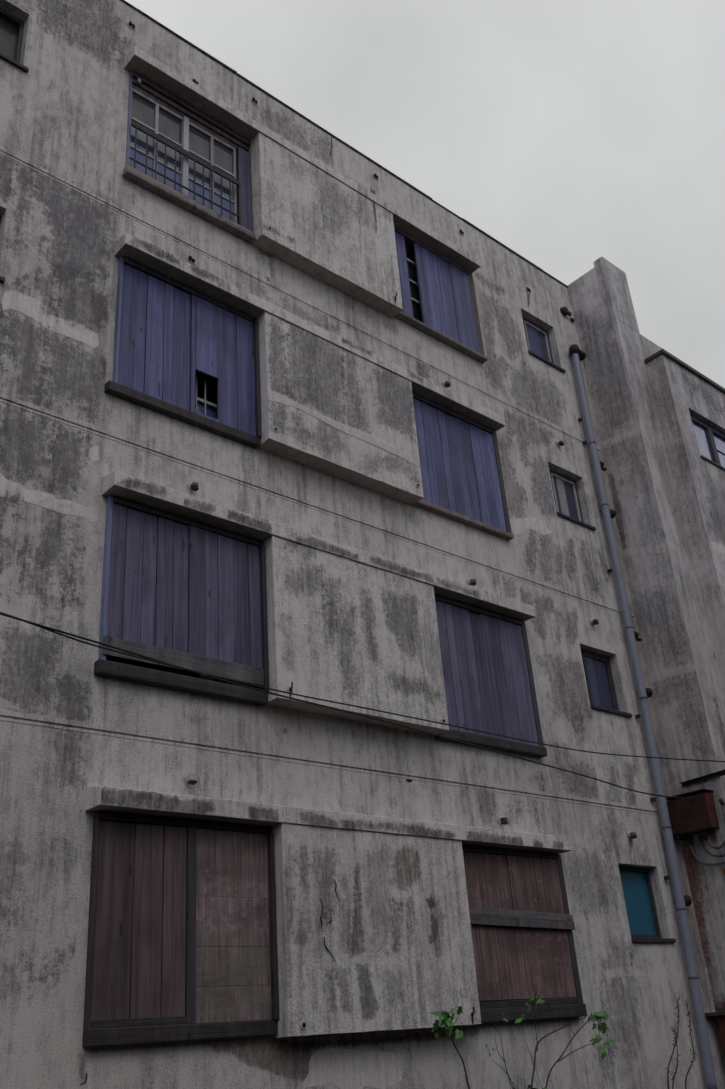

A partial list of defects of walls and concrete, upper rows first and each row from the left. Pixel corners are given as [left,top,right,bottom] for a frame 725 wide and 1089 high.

damp [40,0,126,62]
damp [268,310,430,452]
crack [320,879,339,963]
damp [357,964,378,1018]